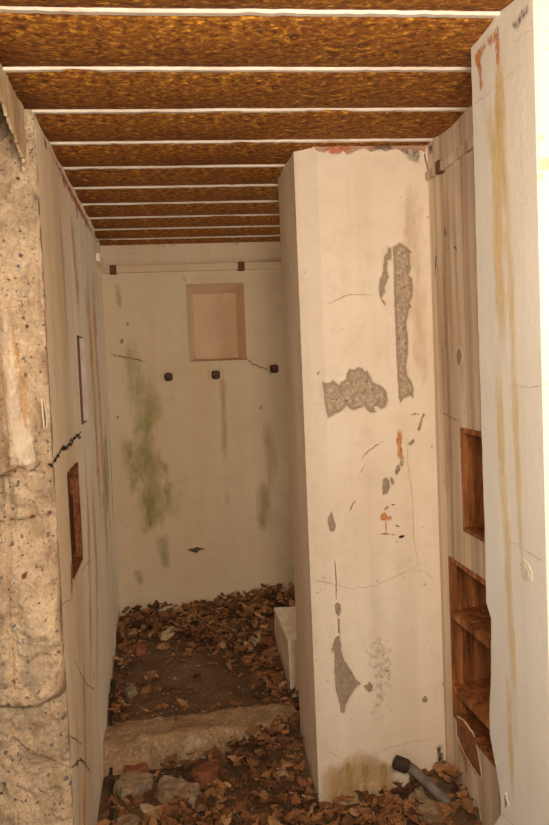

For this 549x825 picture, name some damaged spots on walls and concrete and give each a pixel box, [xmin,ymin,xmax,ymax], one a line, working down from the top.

rust [475,28,499,90]
spalling [0,64,27,171]
spalling [320,242,415,419]
crack [1,431,82,475]
spalling [330,602,374,714]
crack [0,731,90,771]
water stain [328,761,392,805]